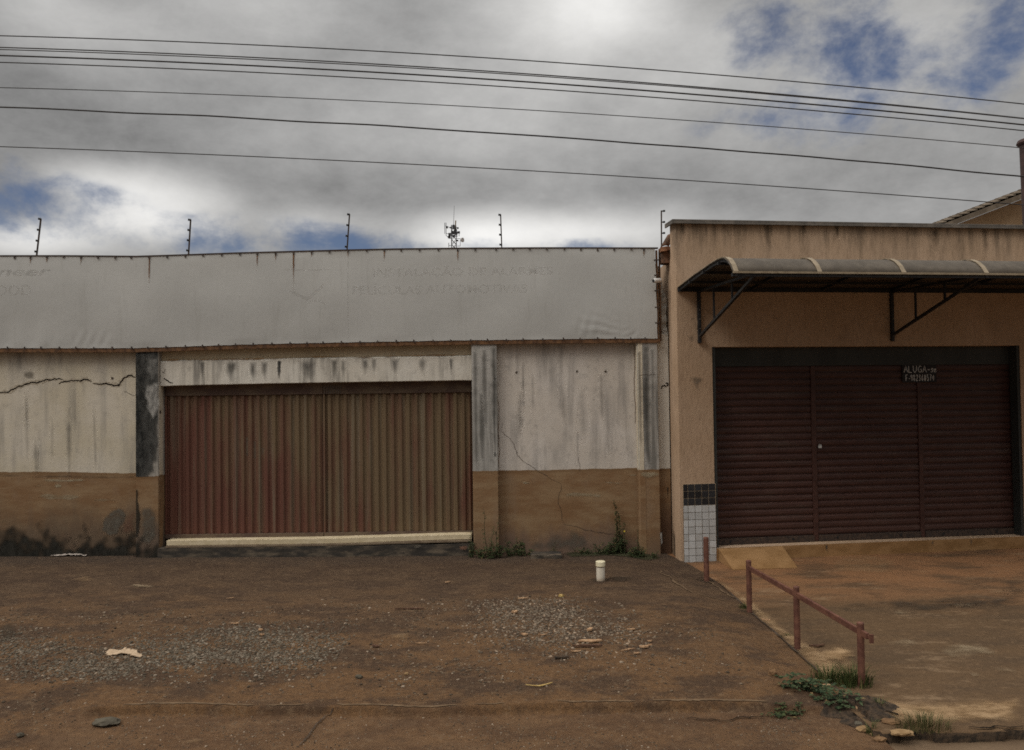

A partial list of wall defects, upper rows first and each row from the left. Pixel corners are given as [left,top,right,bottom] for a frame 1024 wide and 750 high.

crack [0,373,136,396]
leakage [0,490,158,558]
leakage [136,352,158,477]
crack [498,401,607,534]